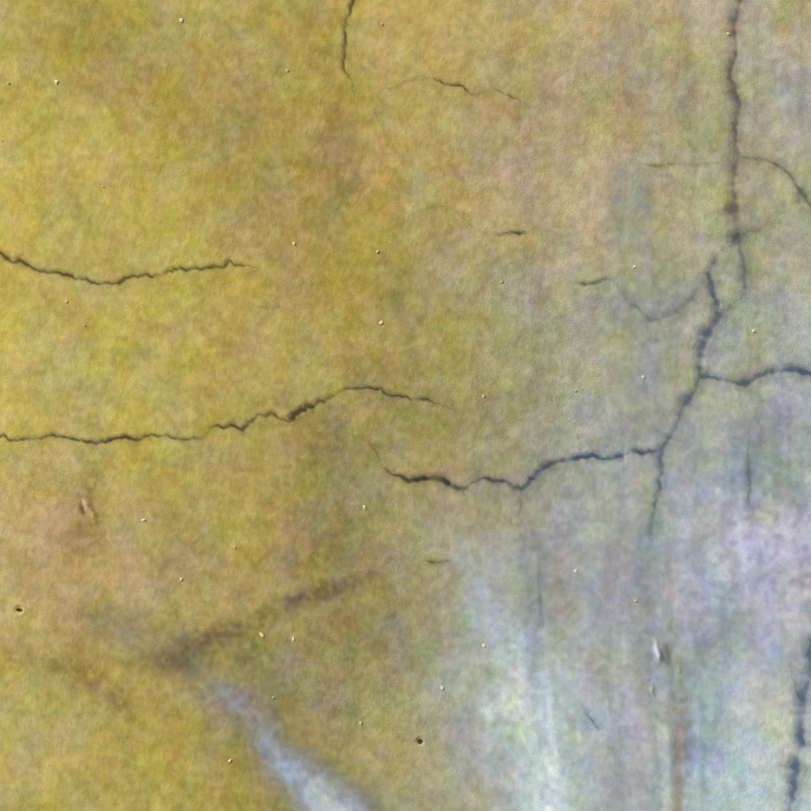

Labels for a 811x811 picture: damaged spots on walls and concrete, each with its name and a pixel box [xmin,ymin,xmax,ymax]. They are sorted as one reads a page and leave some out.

crack [342,0,354,69]
crack [727,0,741,143]
crack [0,252,242,284]
crack [683,271,811,405]
crack [0,434,187,444]
crack [214,399,324,431]
crack [394,474,460,489]
crack [480,435,671,508]
water stain [659,445,811,764]
water stain [473,549,676,811]
water stain [210,683,371,811]
crack [789,727,804,799]